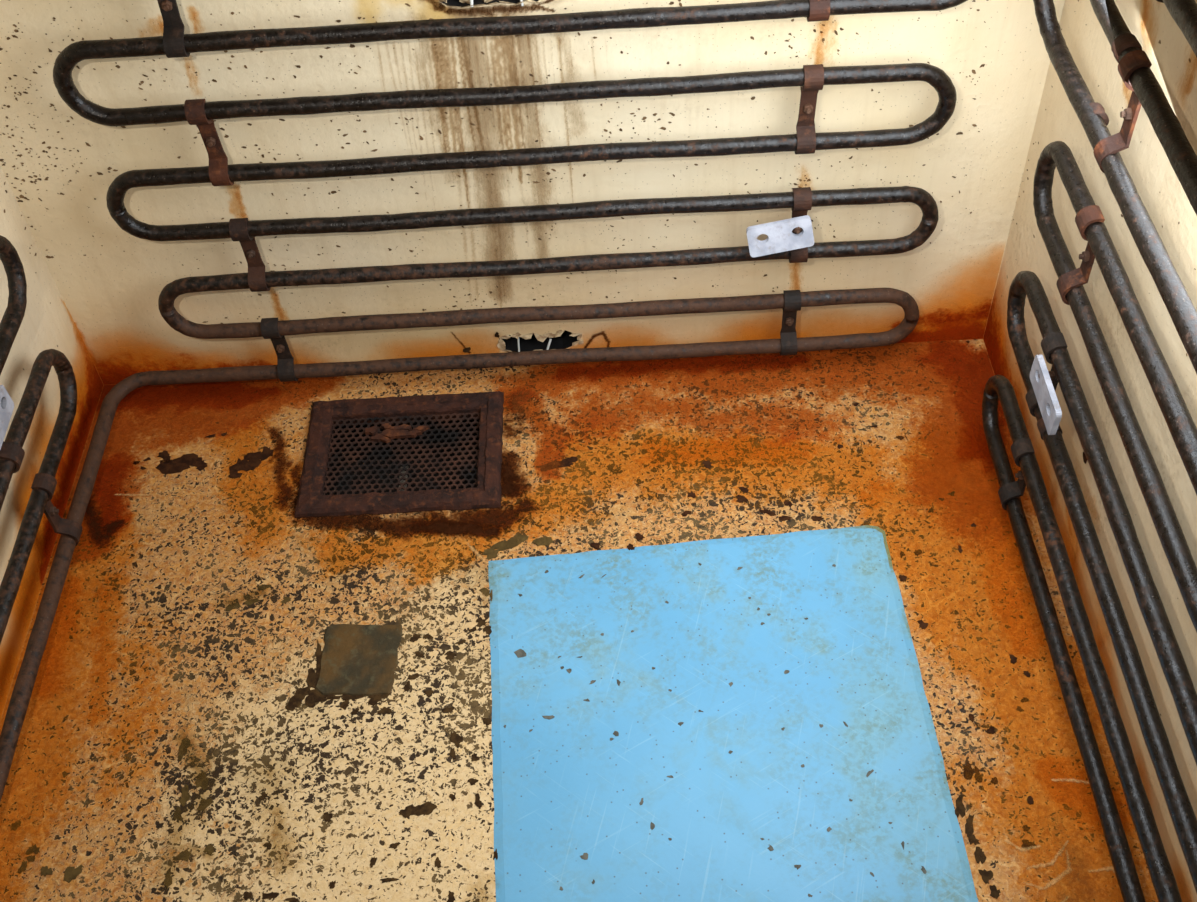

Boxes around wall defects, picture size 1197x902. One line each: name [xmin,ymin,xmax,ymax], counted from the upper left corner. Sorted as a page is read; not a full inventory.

spalling [429,0,567,20]
peeling [764,17,858,58]
peeling [0,17,118,230]
peeling [600,99,675,142]
spalling [495,330,609,352]
rust [896,315,1001,375]
rust [365,423,430,443]
rust [86,464,129,543]
rust [270,429,533,537]